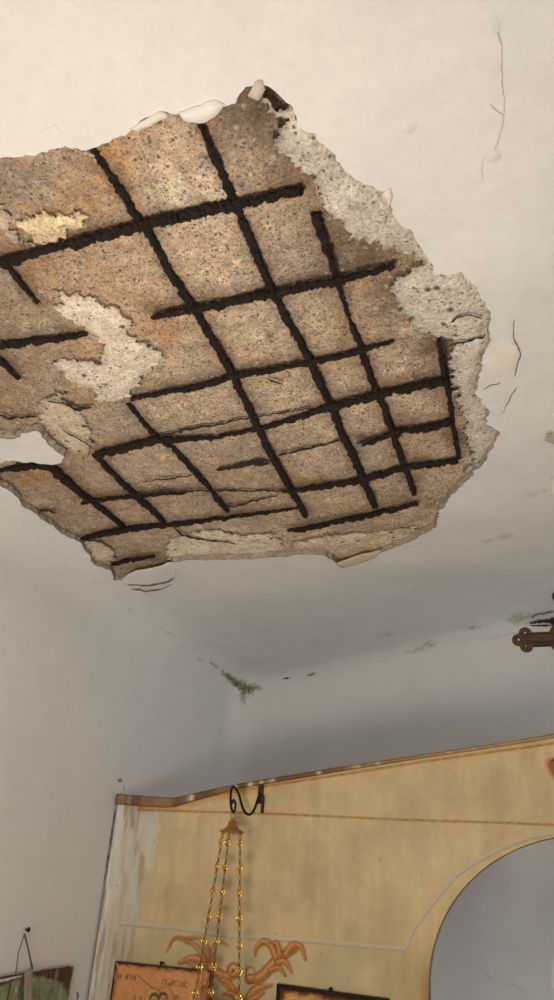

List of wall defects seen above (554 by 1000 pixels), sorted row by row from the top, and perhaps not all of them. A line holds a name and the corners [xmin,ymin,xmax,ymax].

crack [481,32,506,172]
spalling [0,79,518,590]
crack [445,314,485,348]
crack [485,323,521,438]